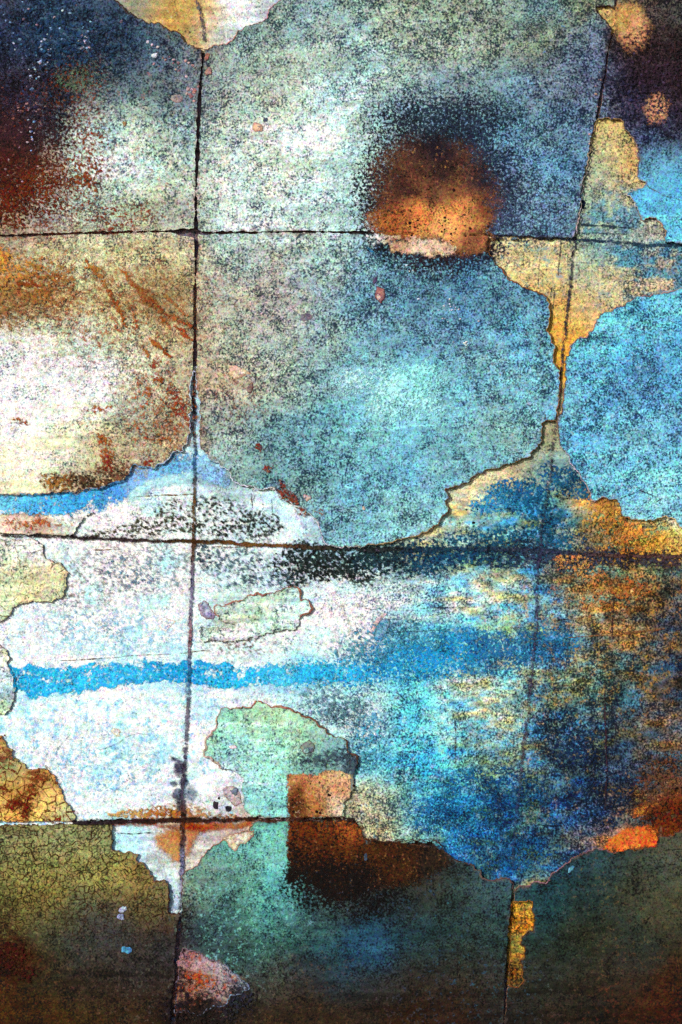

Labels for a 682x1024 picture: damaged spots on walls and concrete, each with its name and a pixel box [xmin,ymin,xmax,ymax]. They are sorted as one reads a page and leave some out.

peeling [115,0,281,103]
rust [0,57,159,241]
rust [347,87,569,282]
crack [538,223,631,313]
rust [0,246,202,493]
crack [0,539,64,617]
peeling [0,117,682,917]
crack [554,597,664,639]
crack [0,735,170,951]
rust [278,770,455,924]
peeling [171,948,250,1016]
peeling [505,897,535,988]